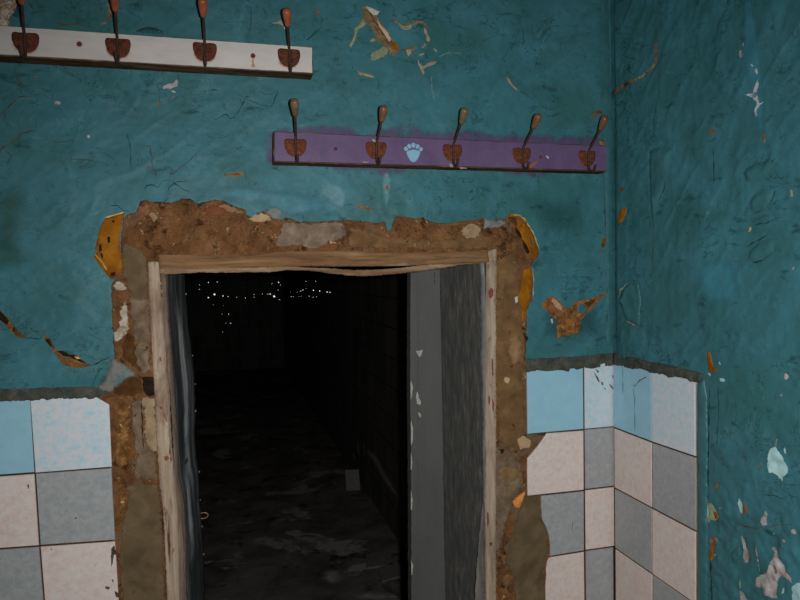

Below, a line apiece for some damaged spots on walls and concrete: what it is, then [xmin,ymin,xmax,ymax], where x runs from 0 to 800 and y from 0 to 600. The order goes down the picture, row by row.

peeling [350,6,437,75]
peeling [745,62,763,116]
spalling [94,198,608,600]
peeling [767,439,788,482]
peeling [731,533,800,600]